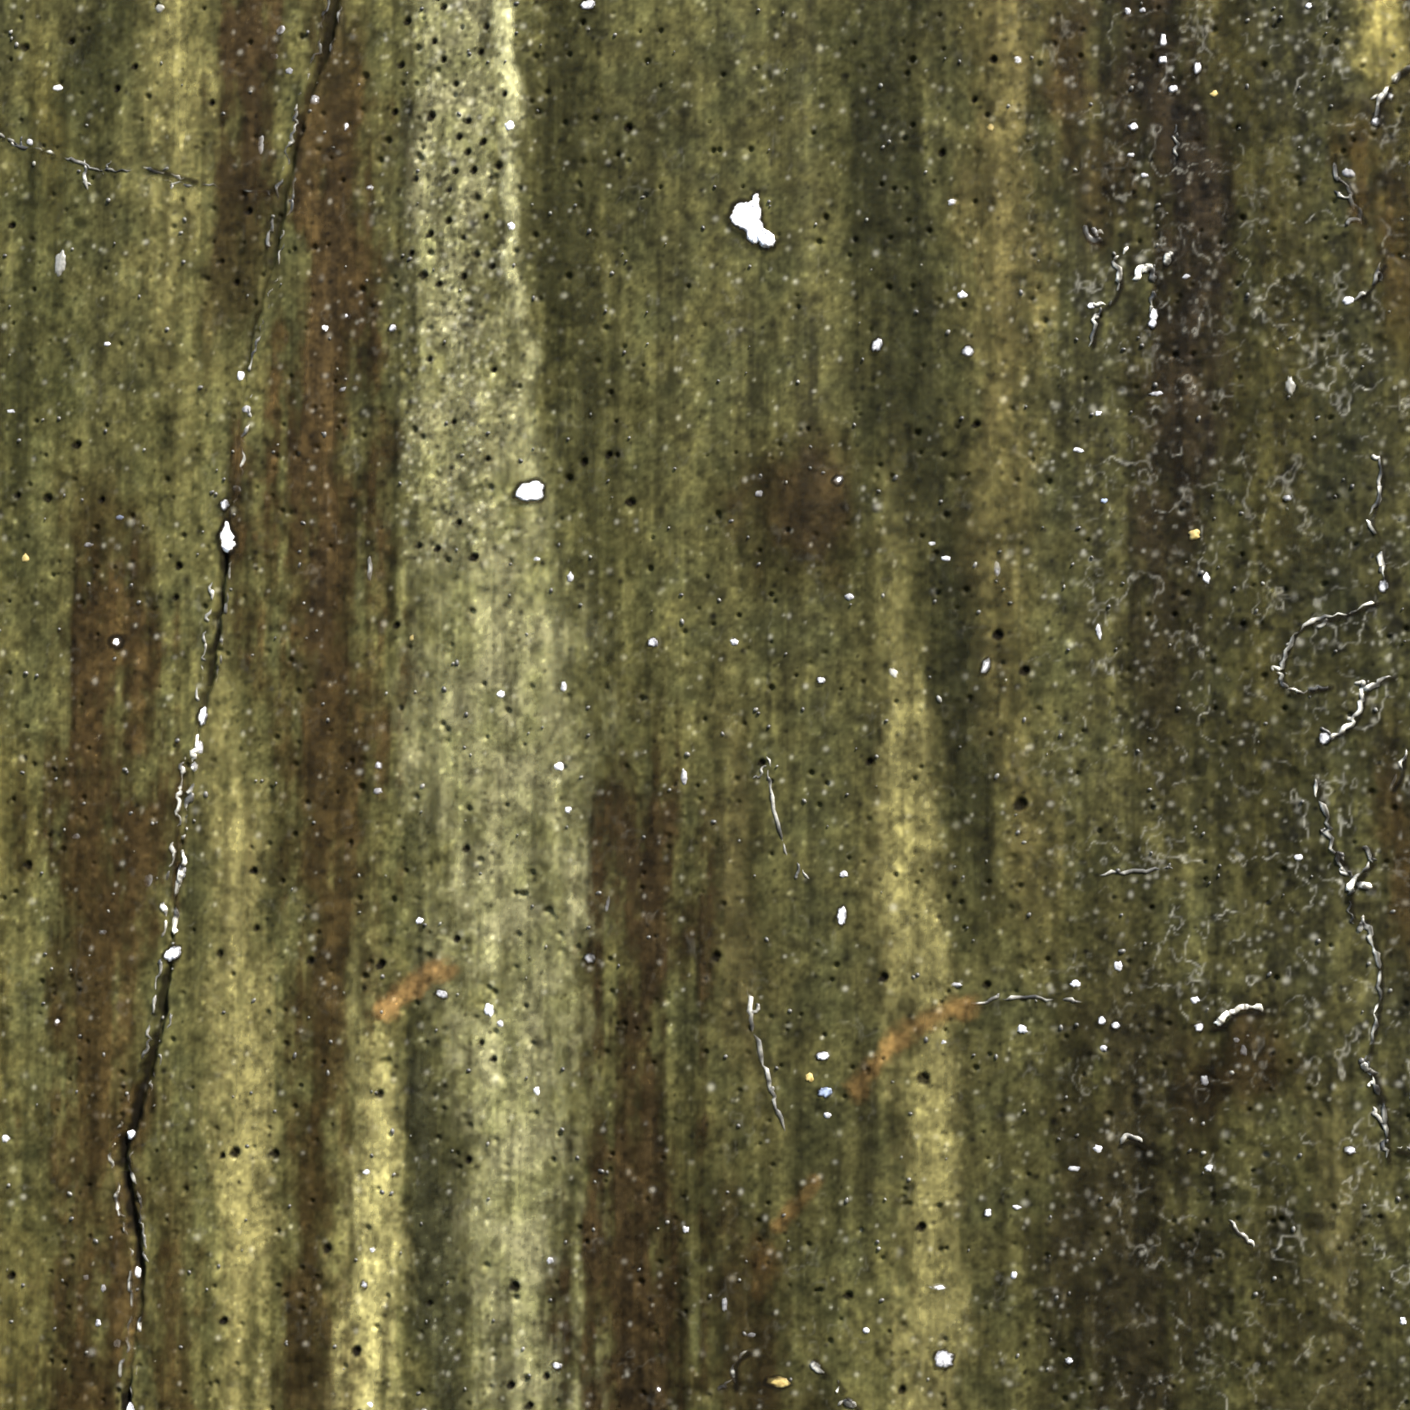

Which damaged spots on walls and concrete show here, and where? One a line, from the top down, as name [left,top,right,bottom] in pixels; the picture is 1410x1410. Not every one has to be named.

leakage [958,0,1044,442]
leakage [1105,0,1242,695]
crack [1332,154,1367,226]
crack [1353,263,1387,301]
crack [1371,65,1410,125]
crack [0,0,342,1410]
leakage [326,0,632,1410]
leakage [845,0,999,1410]
crack [1271,454,1397,740]
leakage [201,765,281,1410]
leakage [1024,978,1214,1410]
crack [1314,778,1391,1163]